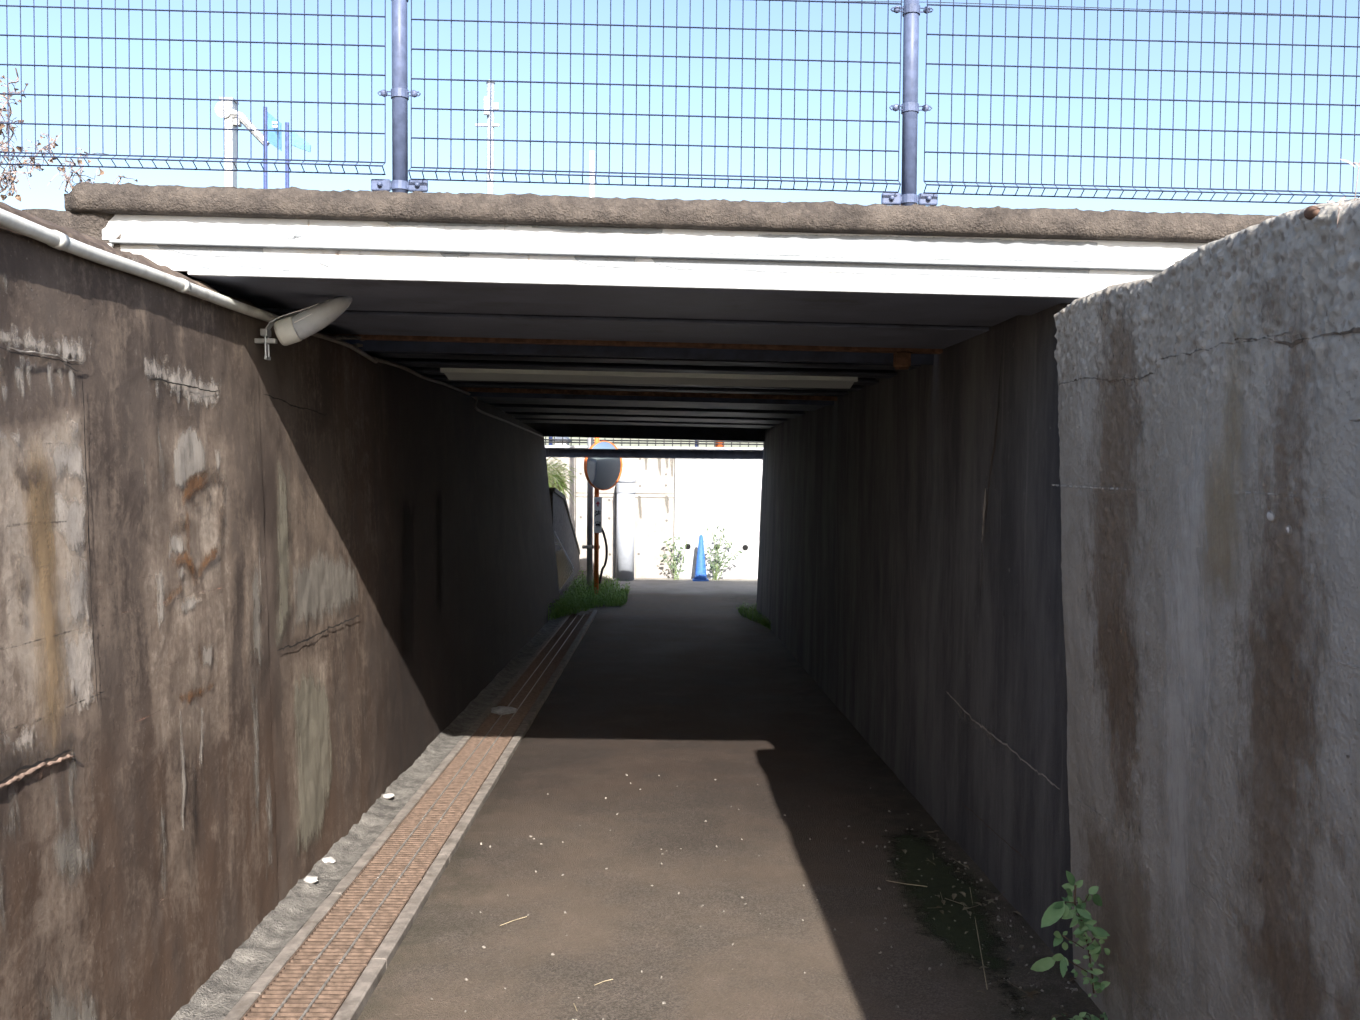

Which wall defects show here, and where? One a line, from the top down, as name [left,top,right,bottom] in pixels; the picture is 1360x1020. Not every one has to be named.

peeling [384,221,1098,280]
peeling [144,358,219,410]
crack [1059,327,1360,385]
corrosion [169,469,226,602]
leakage [1092,316,1139,825]
leakage [1241,323,1314,1020]